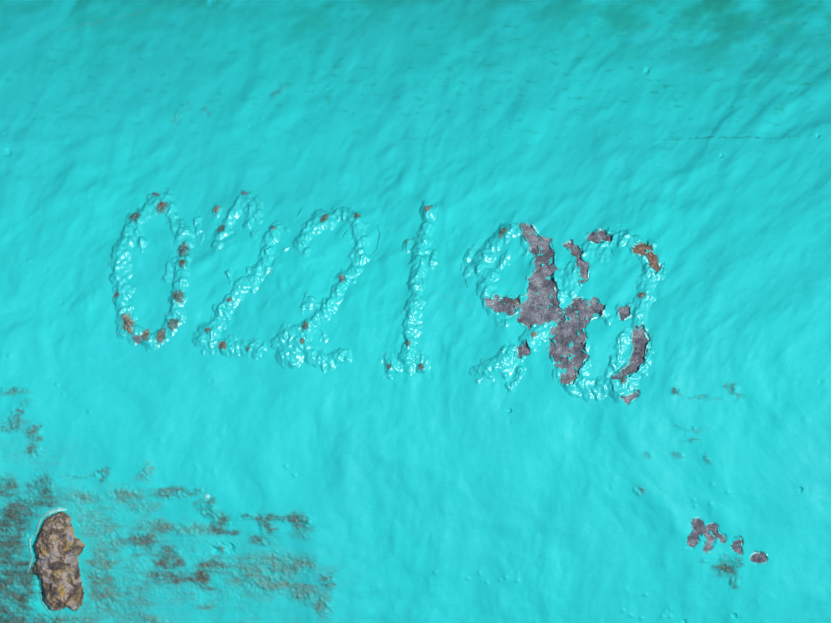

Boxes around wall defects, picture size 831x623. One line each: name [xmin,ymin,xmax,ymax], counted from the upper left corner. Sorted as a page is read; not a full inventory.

peeling [632,242,665,274]
peeling [484,222,615,387]
corrosion [122,314,179,344]
peeling [609,305,653,382]
peeling [620,386,640,405]
corrosion [0,479,60,623]
corrosion [156,547,223,589]
peeling [687,517,768,565]